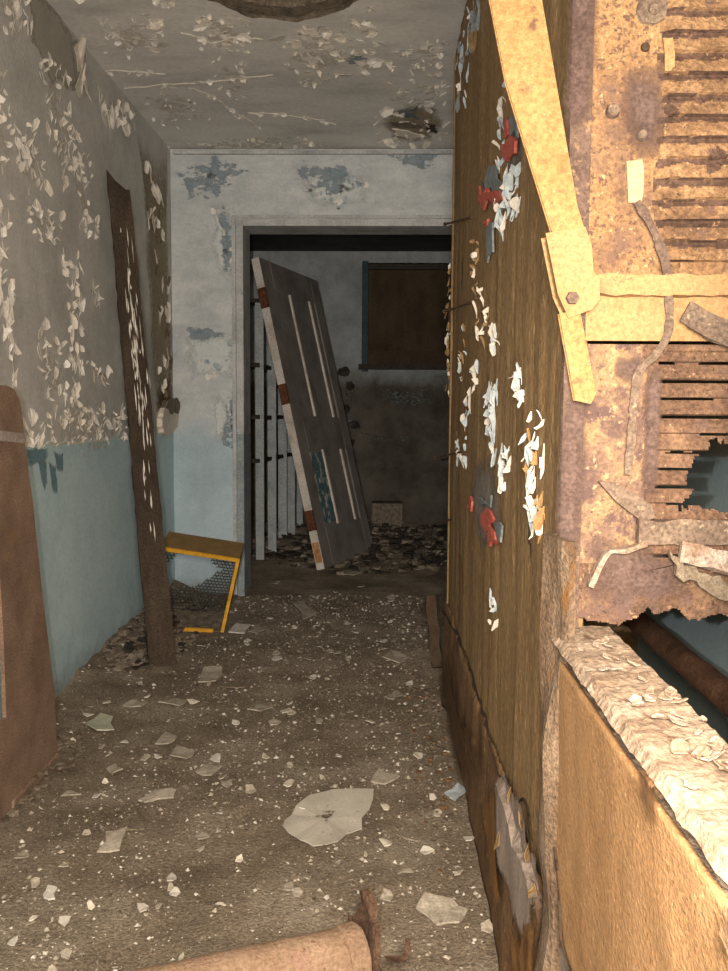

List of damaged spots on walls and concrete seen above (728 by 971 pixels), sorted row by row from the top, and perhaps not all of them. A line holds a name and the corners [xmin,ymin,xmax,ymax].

peeling [186,0,480,150]
corrosion [568,0,595,117]
peeling [303,174,369,206]
peeling [0,0,180,508]
peeling [186,334,232,380]
corrosion [617,356,640,379]
corrosion [558,405,586,541]
peeling [488,588,499,631]
crack [441,465,559,870]
corrosion [598,541,728,598]
corrosion [639,770,656,817]
peeling [494,774,541,936]